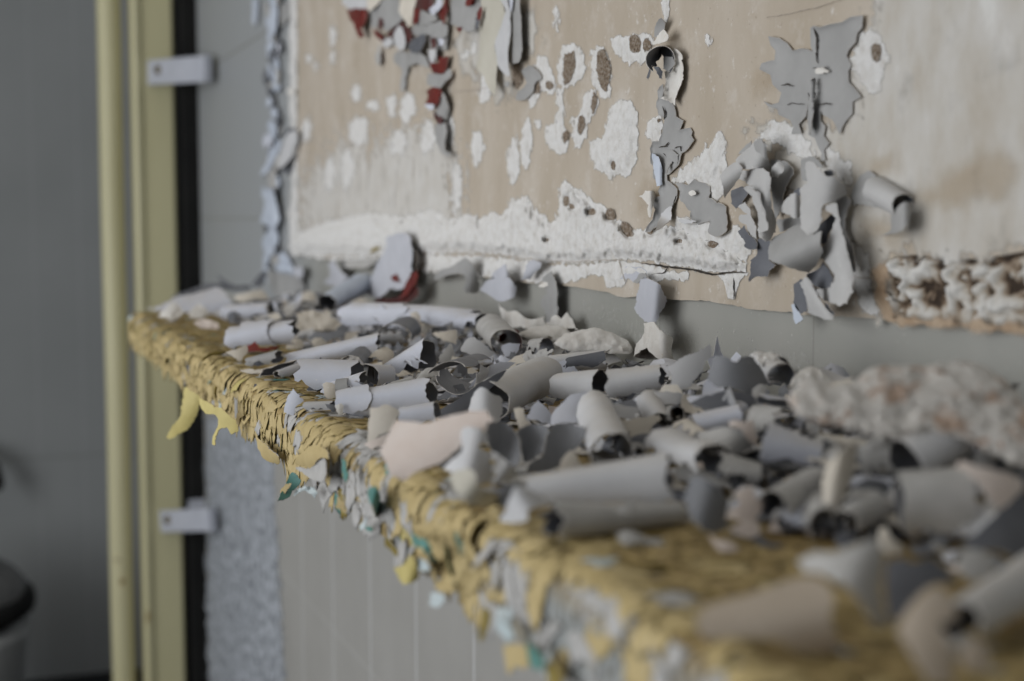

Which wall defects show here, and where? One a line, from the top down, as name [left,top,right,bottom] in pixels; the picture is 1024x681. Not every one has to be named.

peeling [171,0,689,338]
peeling [505,0,1024,334]
damp [743,0,1024,326]
peeling [128,311,1024,681]